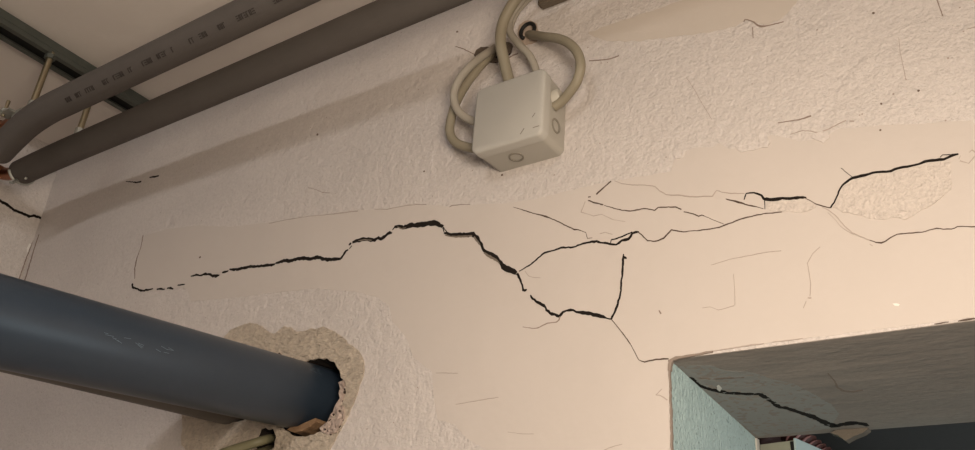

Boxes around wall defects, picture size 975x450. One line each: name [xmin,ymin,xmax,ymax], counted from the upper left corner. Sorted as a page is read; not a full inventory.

crack [0,199,41,280]
crack [131,150,975,363]
peeling [181,323,365,450]
crack [689,377,869,428]